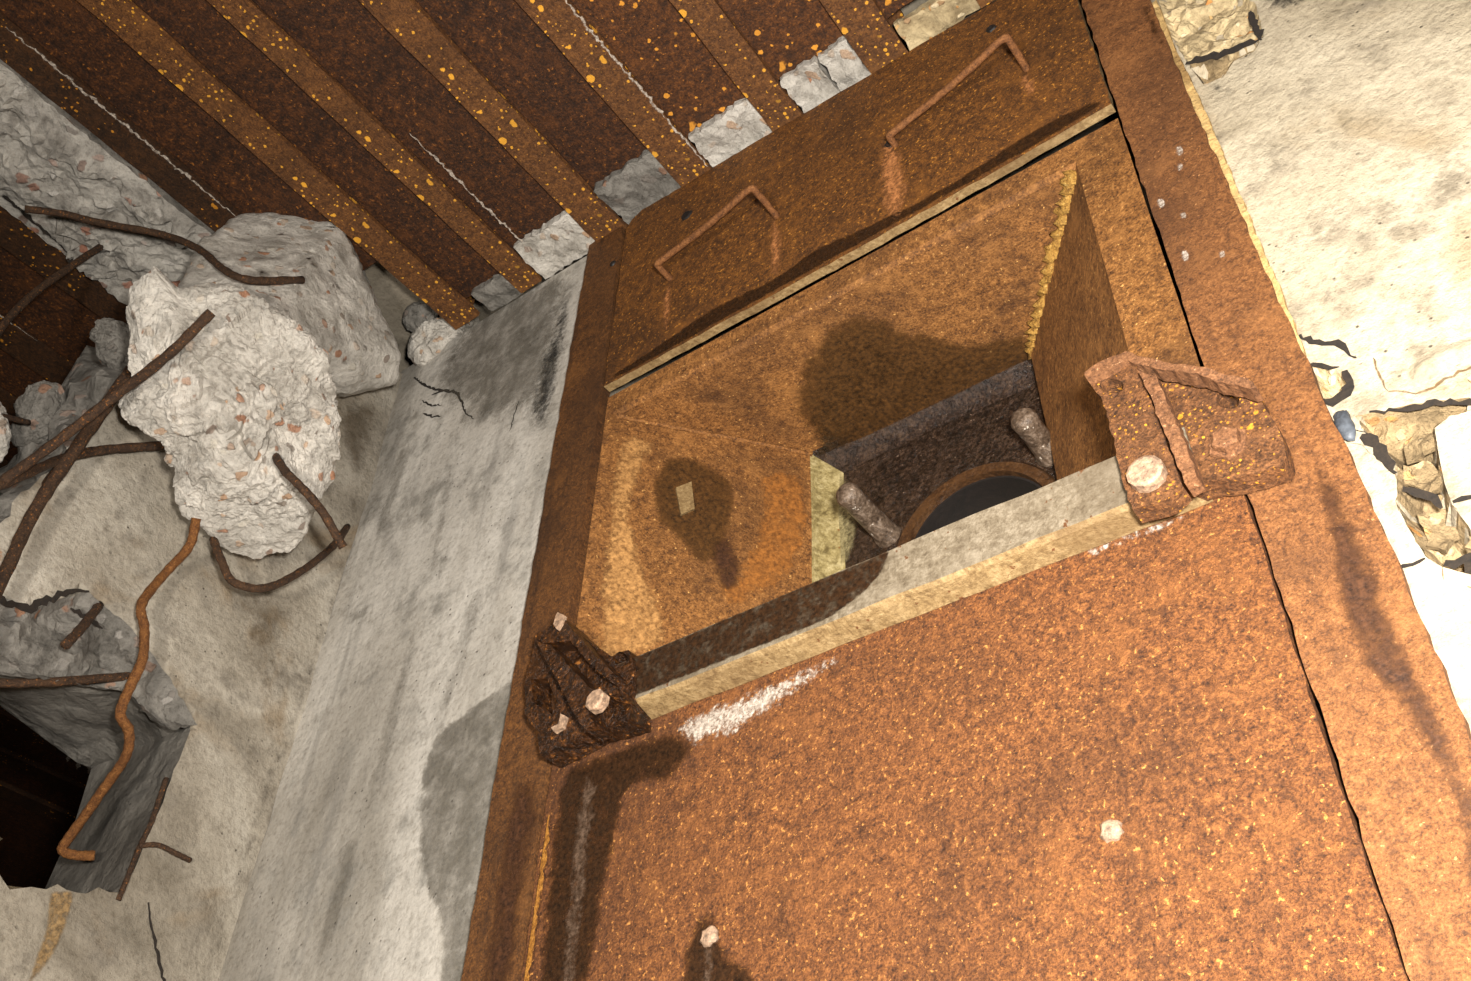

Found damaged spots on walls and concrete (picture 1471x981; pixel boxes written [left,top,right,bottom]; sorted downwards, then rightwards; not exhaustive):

corrosion [882,147,906,214]
leakage [801,318,1029,454]
crack [1298,334,1471,394]
spalling [0,592,197,730]
corrosion [603,439,662,656]
leakage [655,459,737,588]
leakage [618,505,888,695]
crack [1401,558,1471,588]
crack [1452,495,1471,519]
leakage [542,666,825,981]
peeling [32,892,71,978]
corrosion [524,815,550,981]